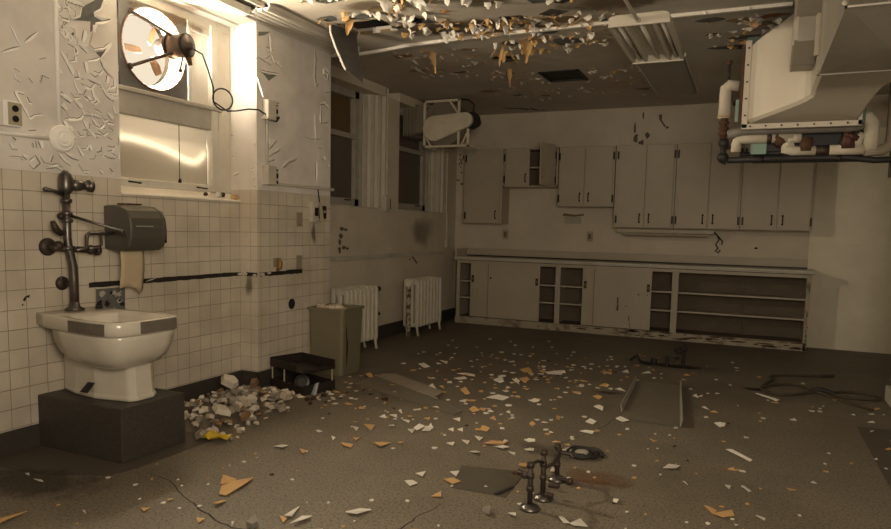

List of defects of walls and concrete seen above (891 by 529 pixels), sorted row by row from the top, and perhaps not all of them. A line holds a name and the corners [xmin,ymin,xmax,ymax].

spalling [9,0,120,175]
peeling [315,0,653,102]
peeling [694,14,783,50]
crack [148,472,242,529]